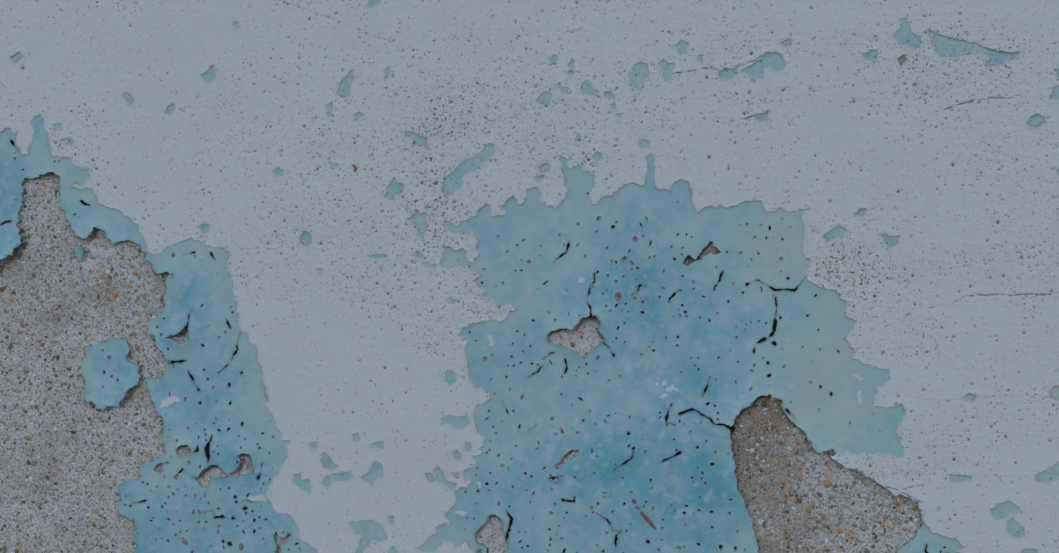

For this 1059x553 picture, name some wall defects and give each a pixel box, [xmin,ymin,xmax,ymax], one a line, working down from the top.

peeling [719,40,791,80]
peeling [893,18,1019,66]
spalling [0,115,317,553]
peeling [409,140,963,553]
peeling [992,501,1024,536]